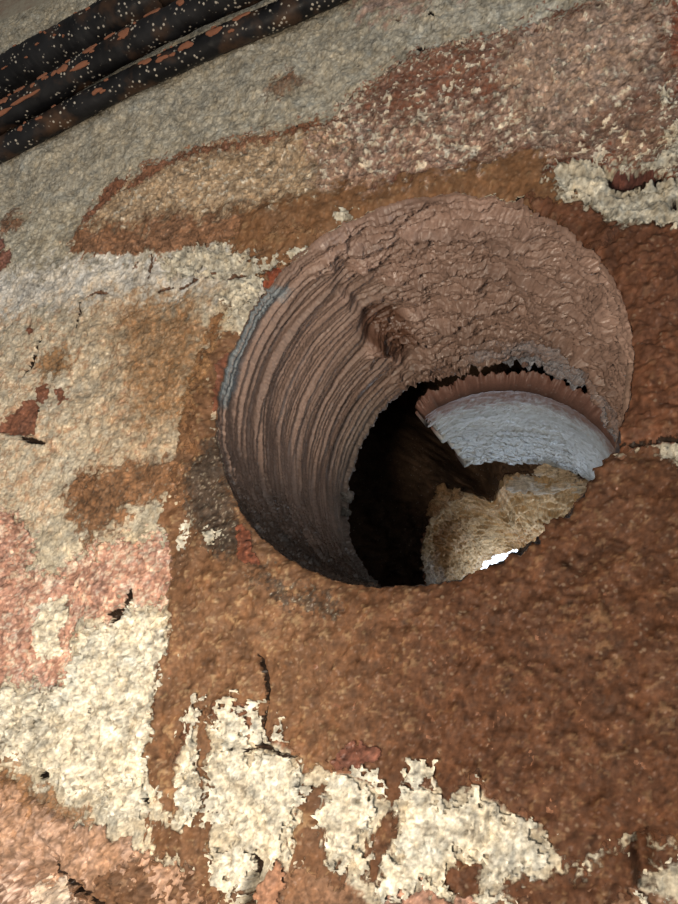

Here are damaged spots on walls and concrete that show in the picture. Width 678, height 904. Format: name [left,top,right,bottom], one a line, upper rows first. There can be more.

peeling [544,0,678,230]
peeling [332,206,359,224]
spalling [0,233,12,271]
peeling [159,242,308,326]
spalling [0,383,69,437]
crack [619,436,678,448]
crack [242,655,297,758]
peeling [0,505,558,904]
peeling [633,889,669,904]